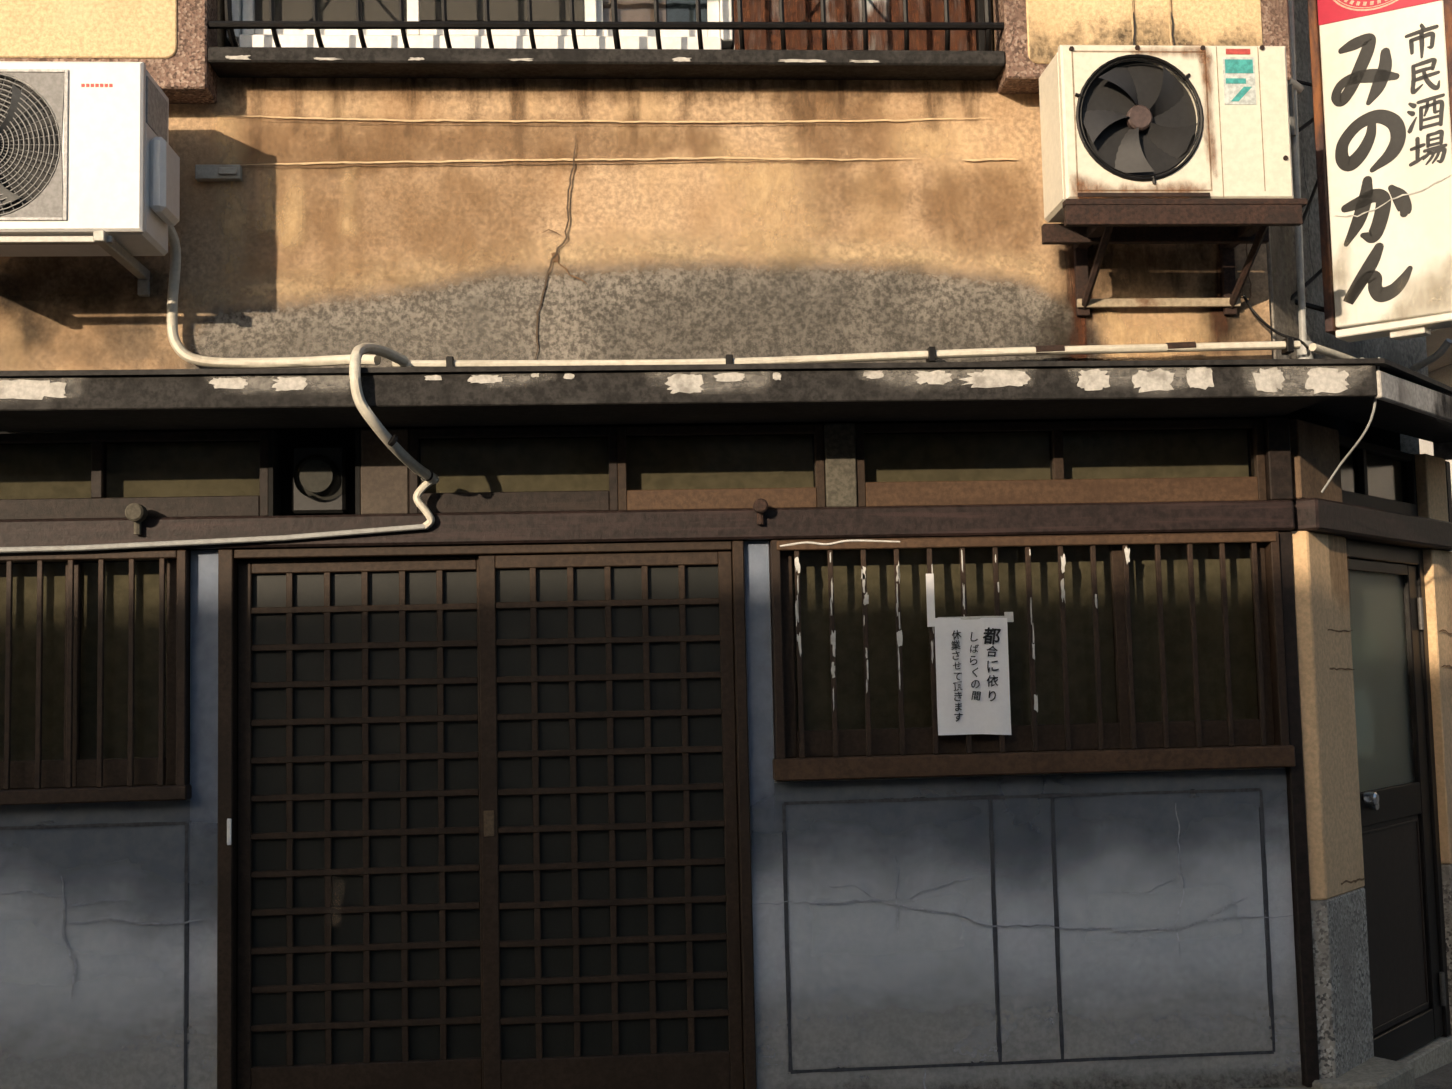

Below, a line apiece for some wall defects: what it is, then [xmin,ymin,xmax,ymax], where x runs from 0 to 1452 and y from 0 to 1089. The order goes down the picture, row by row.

corrosion [734,0,977,51]
crack [962,155,1017,163]
crack [217,115,988,360]
flaking render [190,239,1214,394]
peeling [0,377,78,400]
peeling [1248,365,1369,396]
crack [754,807,1292,961]